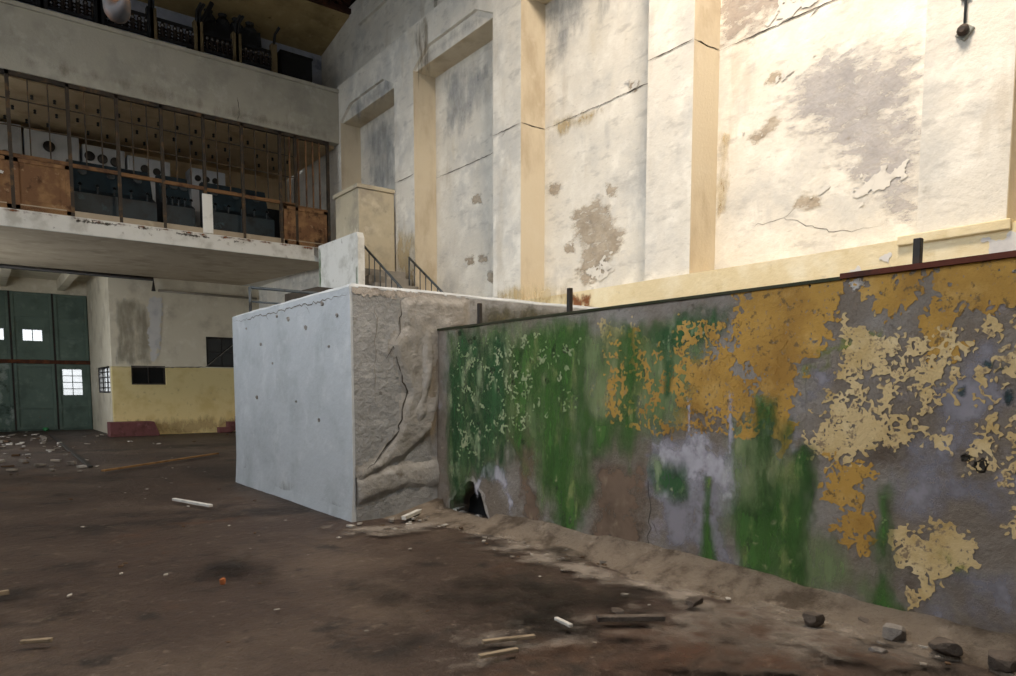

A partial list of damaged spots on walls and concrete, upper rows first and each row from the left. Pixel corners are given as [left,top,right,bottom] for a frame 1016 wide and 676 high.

peeling [721,0,818,40]
peeling [565,186,629,289]
leakage [755,395,791,450]
peeling [597,231,1016,611]
leakage [648,395,739,562]
leakage [757,446,813,563]
spalling [802,610,825,628]
spalling [868,623,906,655]